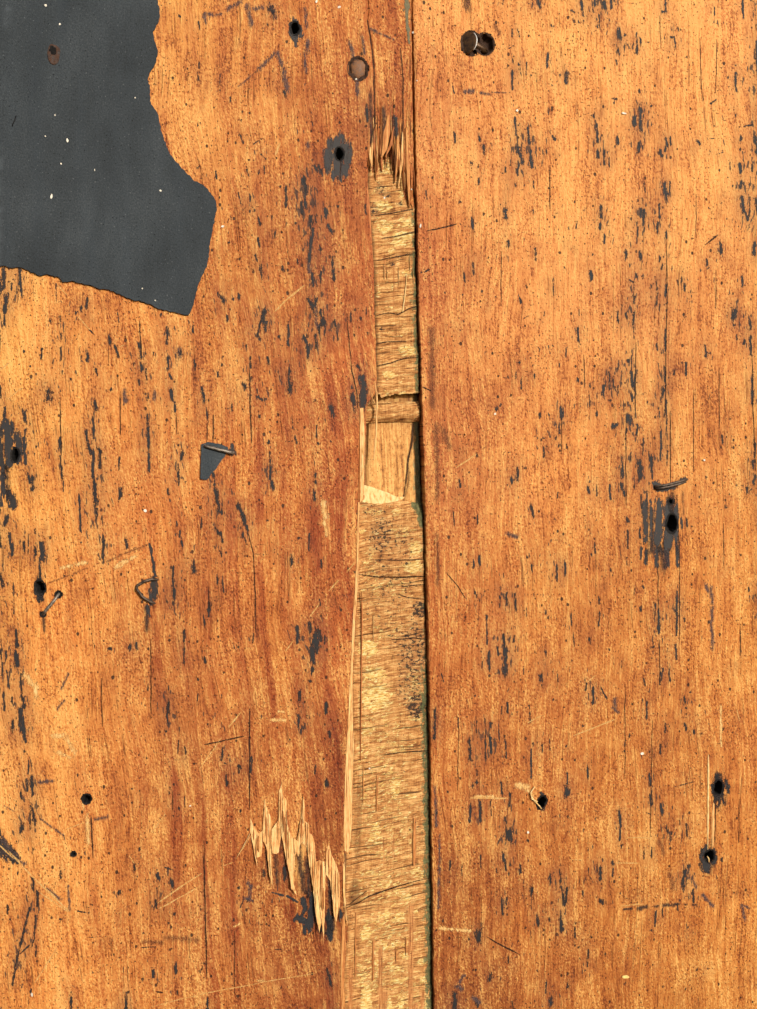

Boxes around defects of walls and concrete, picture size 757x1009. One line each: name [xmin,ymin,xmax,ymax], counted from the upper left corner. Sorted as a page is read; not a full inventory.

peeling [343,100,432,1009]